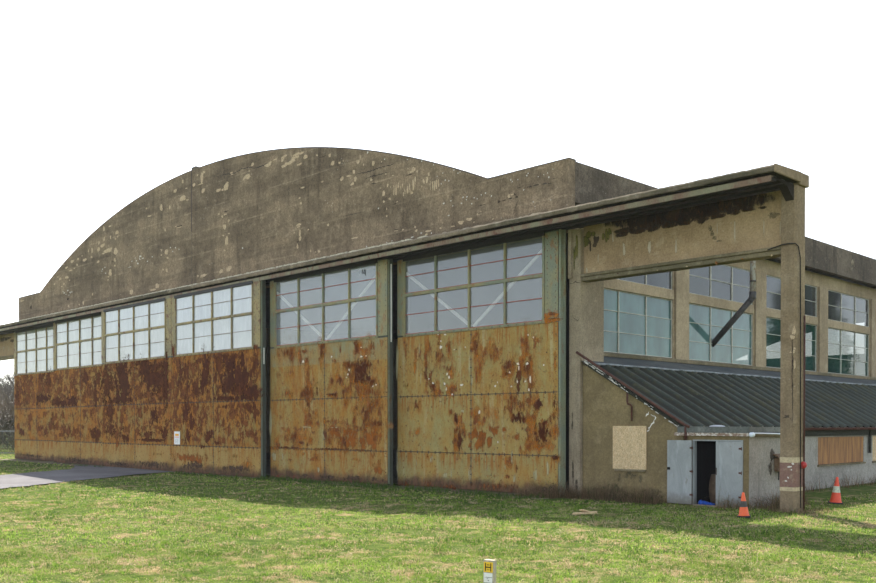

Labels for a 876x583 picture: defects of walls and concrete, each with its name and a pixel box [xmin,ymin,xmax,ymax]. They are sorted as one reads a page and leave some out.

spalling [243,151,344,180]
peeling [370,167,481,243]
spalling [54,225,119,287]
rust [13,338,263,472]
rust [271,336,387,481]
rust [404,335,457,402]
rust [440,331,560,462]